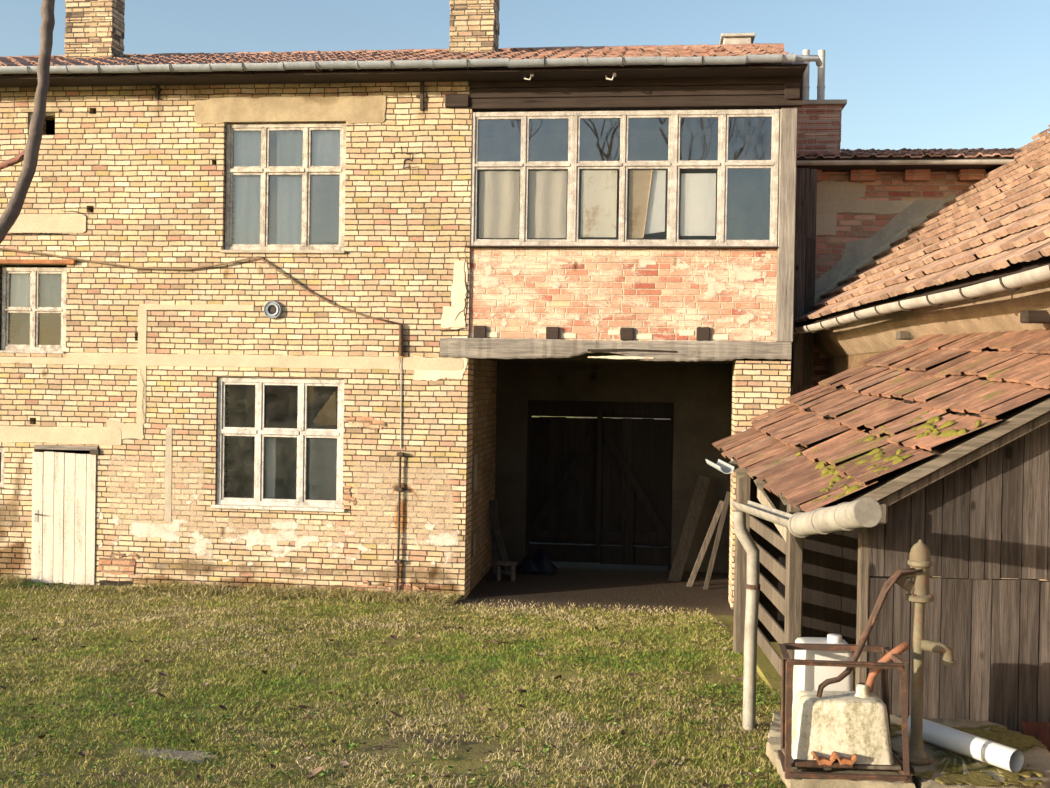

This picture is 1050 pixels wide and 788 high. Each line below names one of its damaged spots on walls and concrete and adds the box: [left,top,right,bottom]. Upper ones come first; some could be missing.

peeling [475,254,568,301]
peeling [632,259,656,276]
peeling [703,253,772,298]
peeling [694,310,771,326]